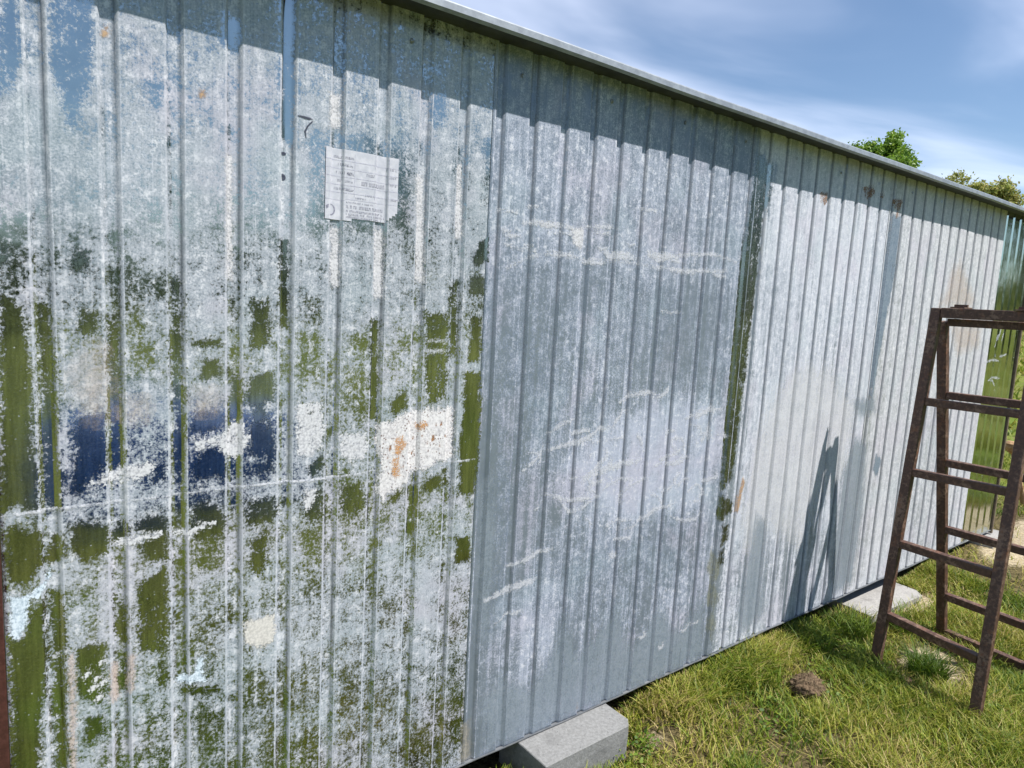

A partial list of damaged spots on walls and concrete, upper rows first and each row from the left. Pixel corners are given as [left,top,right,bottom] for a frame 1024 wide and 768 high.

corrosion [864,185,903,217]
water stain [415,174,426,283]
water stain [373,229,385,299]
water stain [192,419,251,461]
water stain [294,401,457,503]
corrosion [387,421,446,479]
water stain [88,461,157,488]
water stain [304,488,317,511]
water stain [115,520,217,549]
water stain [6,568,55,640]
water stain [82,660,110,703]
water stain [176,658,208,685]